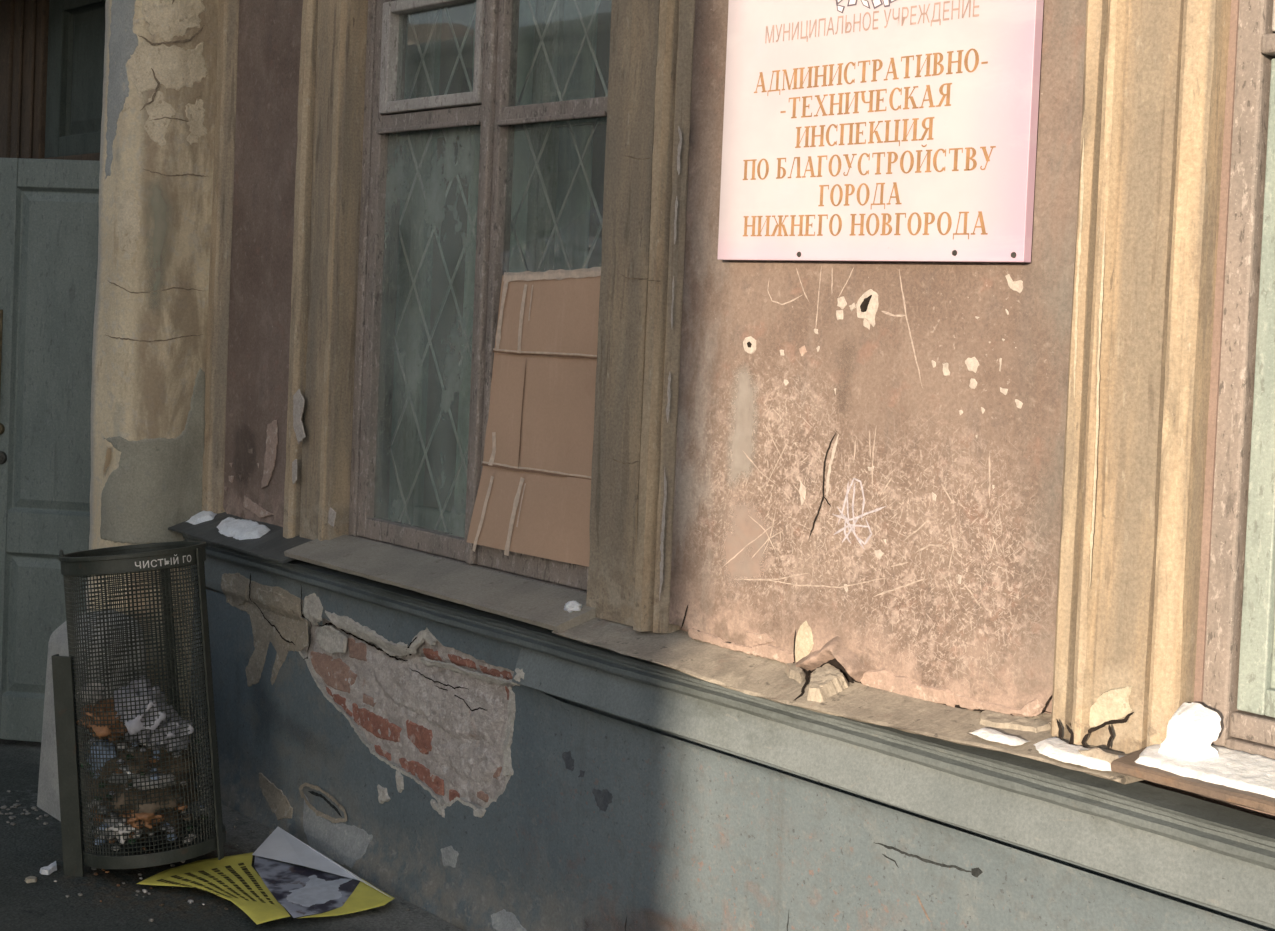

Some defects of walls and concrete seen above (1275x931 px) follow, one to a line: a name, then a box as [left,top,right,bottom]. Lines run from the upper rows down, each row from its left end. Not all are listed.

peeling [127,0,208,147]
peeling [117,187,142,257]
hole [836,289,879,330]
peeling [293,389,306,444]
crack [808,431,839,541]
spalling [221,573,525,821]
peeling [1089,686,1132,728]
crack [874,842,983,877]
peeling [491,909,527,931]